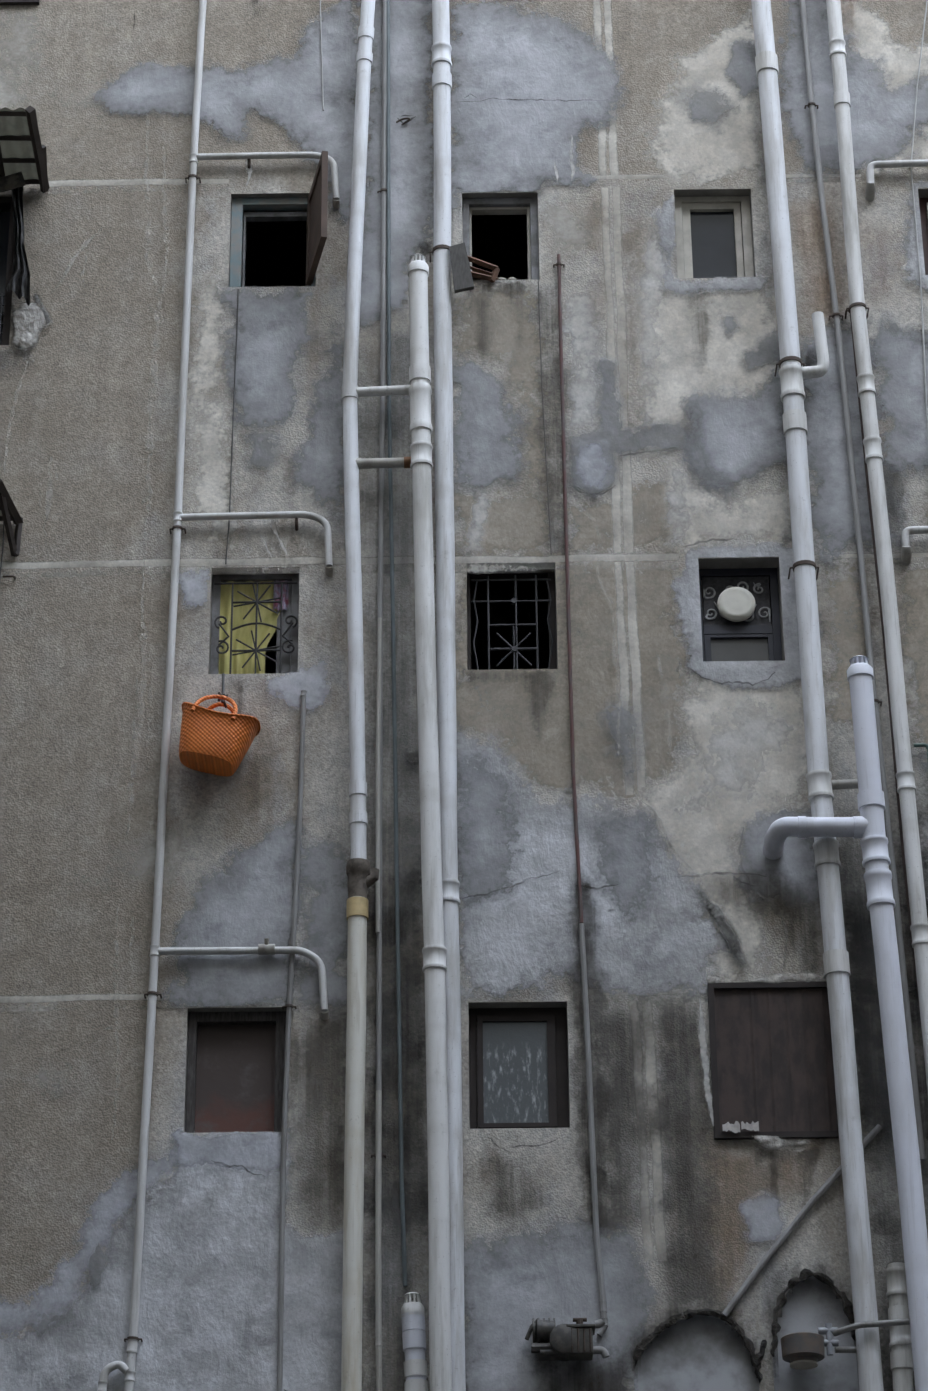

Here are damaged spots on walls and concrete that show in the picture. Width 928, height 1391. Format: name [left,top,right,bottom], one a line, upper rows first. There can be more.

leakage [686,87,732,124]
spalling [10,294,51,349]
leakage [640,235,668,424]
leakage [743,331,780,370]
leakage [452,282,729,801]
leakage [887,467,895,519]
leakage [570,881,715,1305]
spalling [631,1263,860,1391]